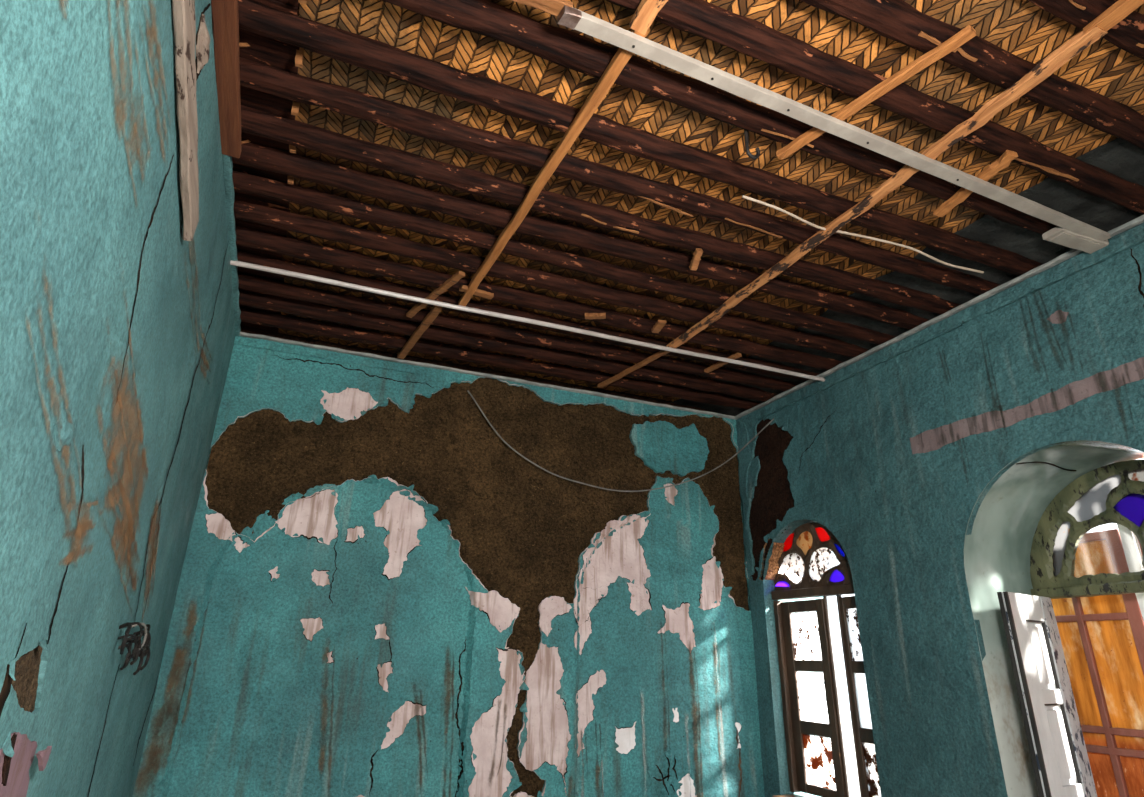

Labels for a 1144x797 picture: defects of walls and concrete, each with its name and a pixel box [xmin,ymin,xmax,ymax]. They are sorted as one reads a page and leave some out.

crack [118,154,174,394]
crack [1130,248,1144,306]
crack [133,244,228,628]
flaking render [203,377,794,797]
flaking render [0,639,48,717]
peeling [0,732,52,797]
crack [88,665,120,796]
crack [133,677,158,766]